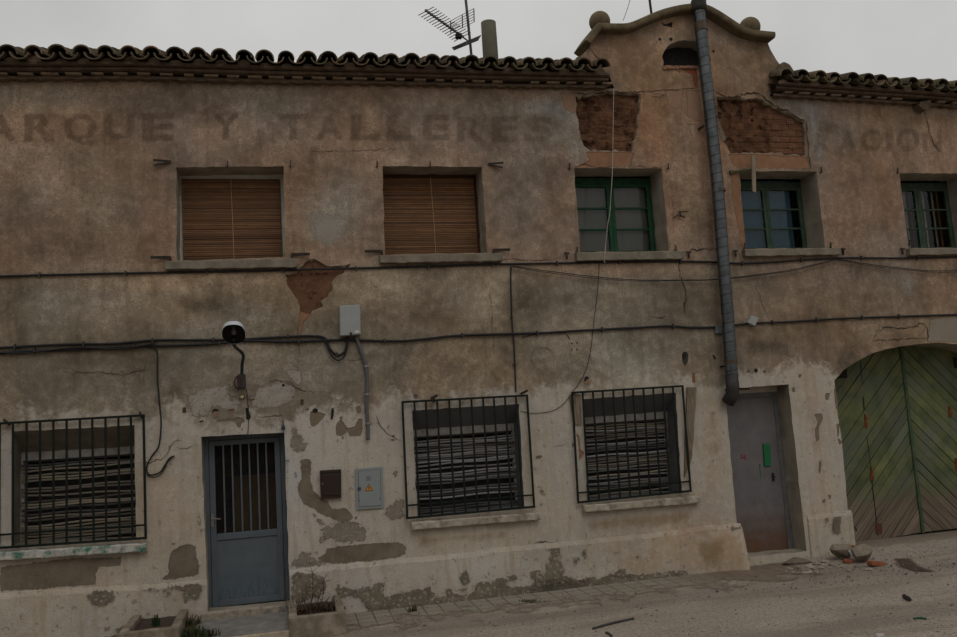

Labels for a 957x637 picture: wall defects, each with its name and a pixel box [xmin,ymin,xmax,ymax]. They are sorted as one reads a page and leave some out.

spalling [663,65,698,87]
flaking render [560,94,639,168]
flaking render [715,96,809,249]
flaking render [287,261,349,335]
peeling [187,369,302,427]
peeling [307,409,325,427]
peeling [336,406,363,441]
peeling [286,426,688,612]
peeling [0,557,121,606]
peeling [147,543,202,603]